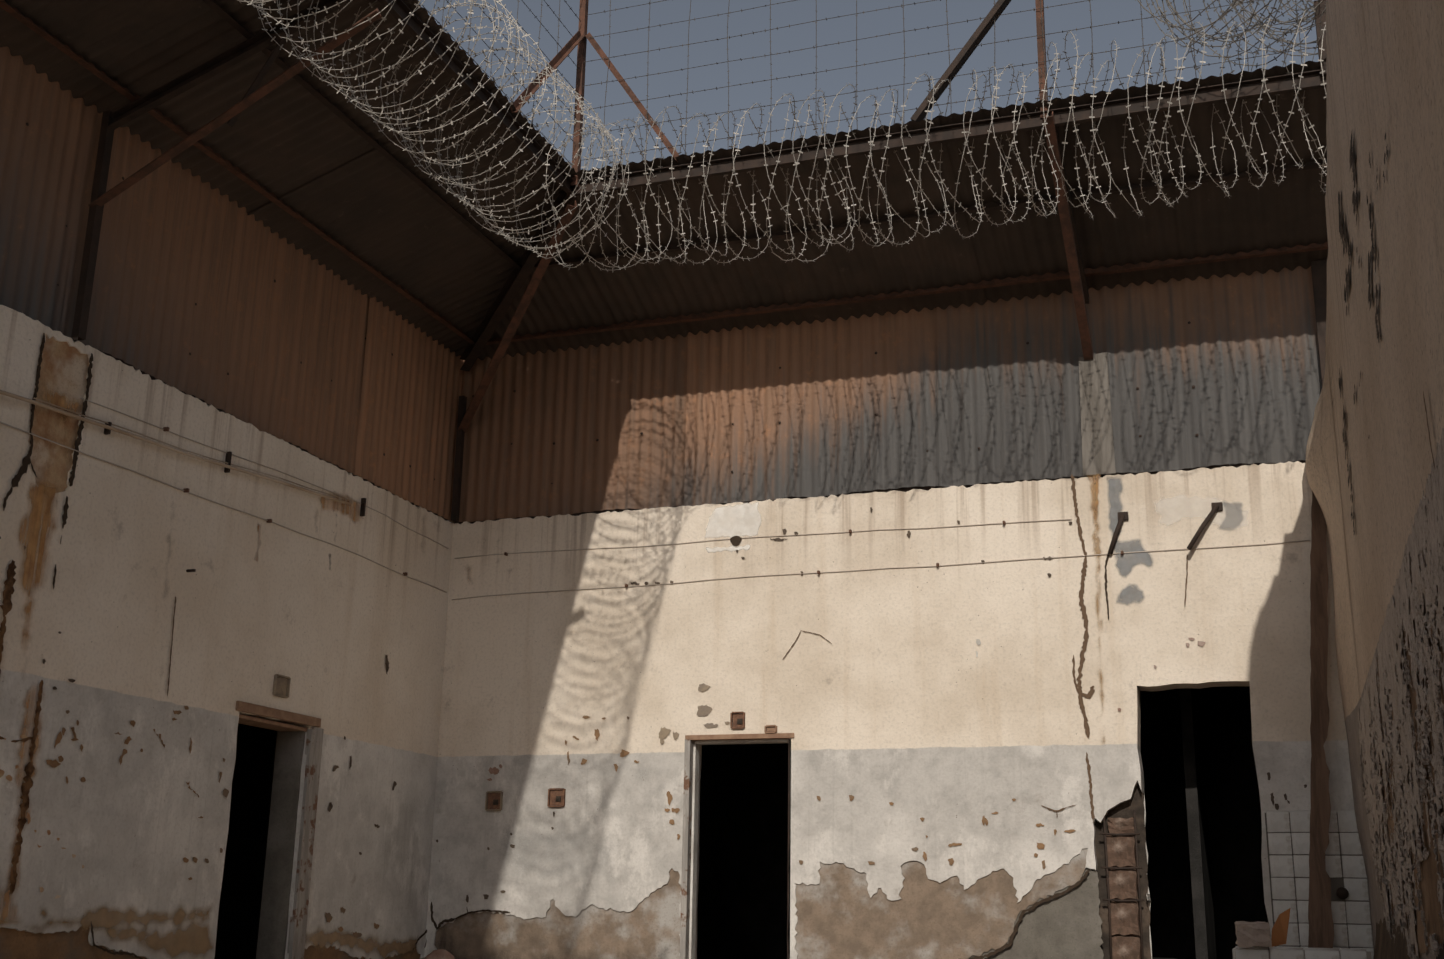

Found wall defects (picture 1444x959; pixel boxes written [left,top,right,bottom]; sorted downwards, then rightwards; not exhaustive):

spalling [1338,132,1388,343]
spalling [1339,371,1361,536]
rust [19,484,56,614]
crack [1041,475,1109,822]
peeling [1358,428,1444,959]
spalling [0,926,147,959]
spalling [304,869,681,959]
spalling [795,783,1151,959]
crack [970,869,1089,959]